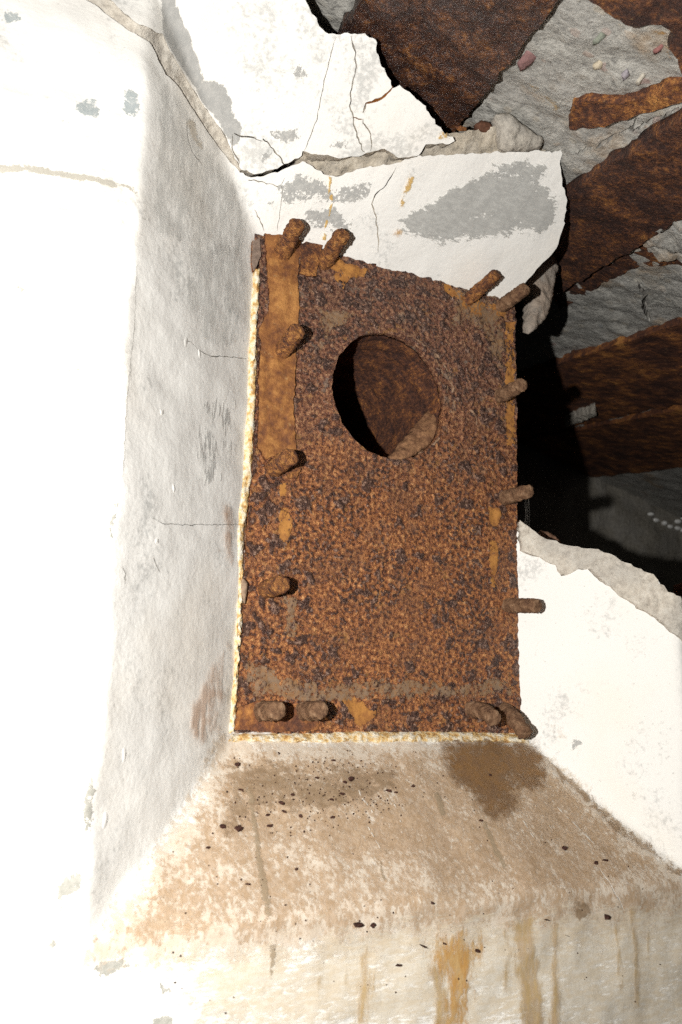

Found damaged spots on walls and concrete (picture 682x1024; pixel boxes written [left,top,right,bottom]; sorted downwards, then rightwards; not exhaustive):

crack [87,0,353,225]
peeling [270,128,299,144]
peeling [267,141,403,232]
crack [350,68,393,152]
peeling [398,126,558,246]
rust [444,284,516,385]
rust [387,409,448,460]
rust [278,483,293,551]
spalling [517,520,682,641]
water stain [247,790,270,916]
rust [83,661,682,1024]
water stain [575,902,590,920]